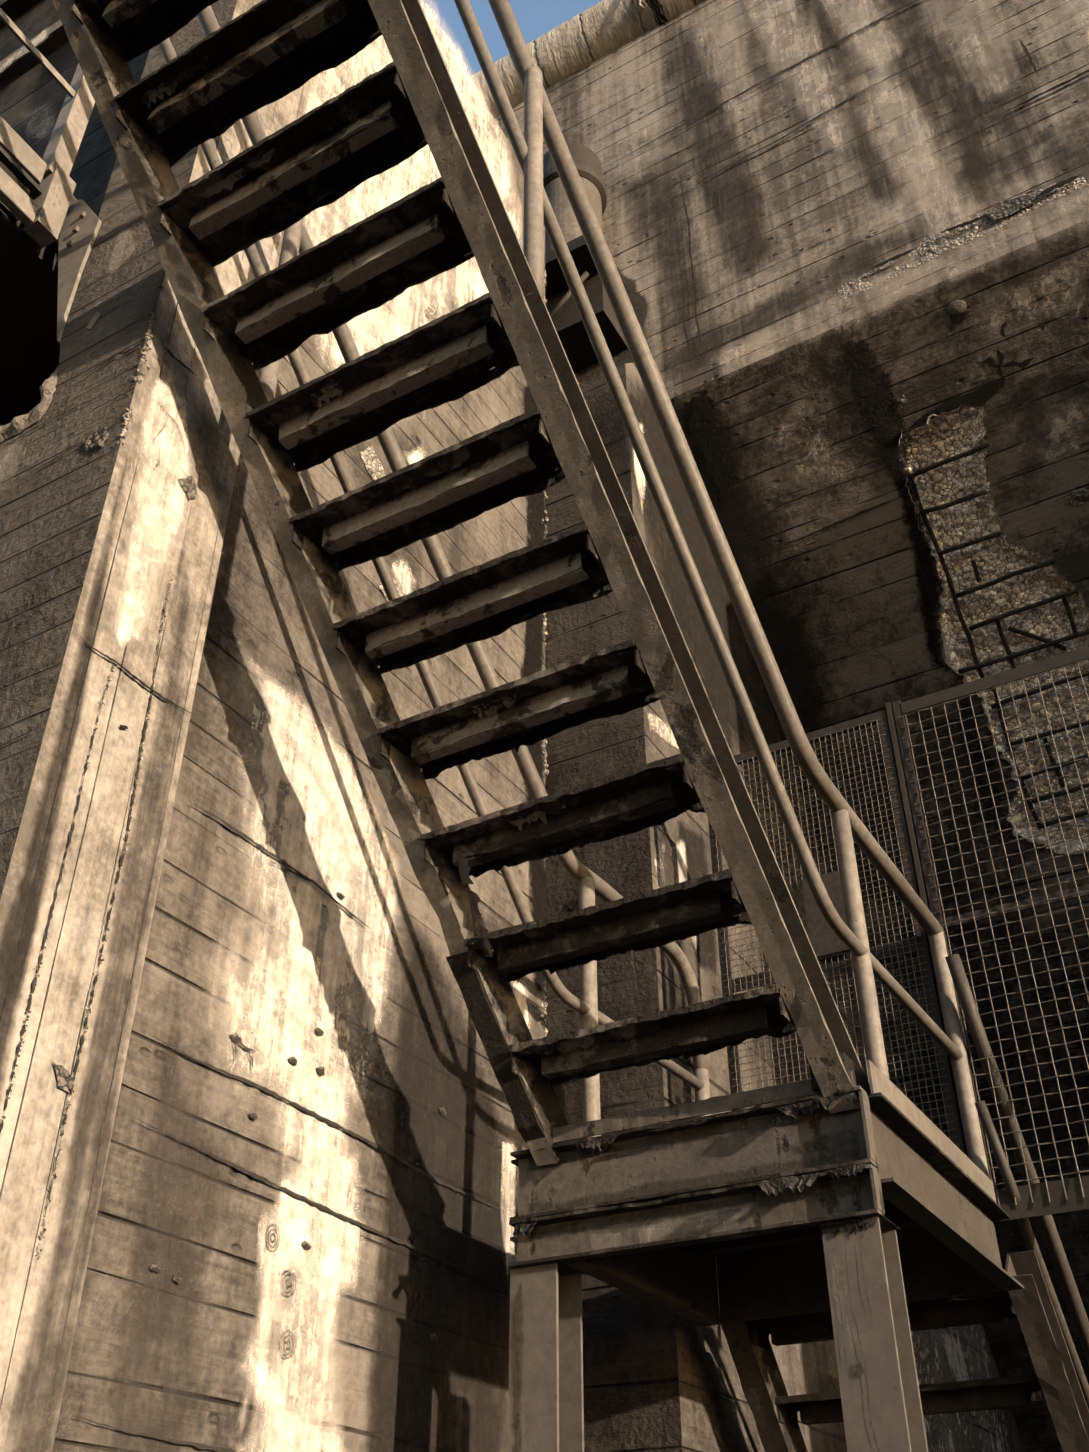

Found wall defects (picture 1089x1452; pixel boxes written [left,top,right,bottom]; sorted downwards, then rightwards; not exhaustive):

spalling [634,0,668,26]
damp [667,8,777,275]
damp [749,0,1039,229]
spalling [0,371,57,443]
damp [839,340,948,672]
spalling [898,405,1089,855]